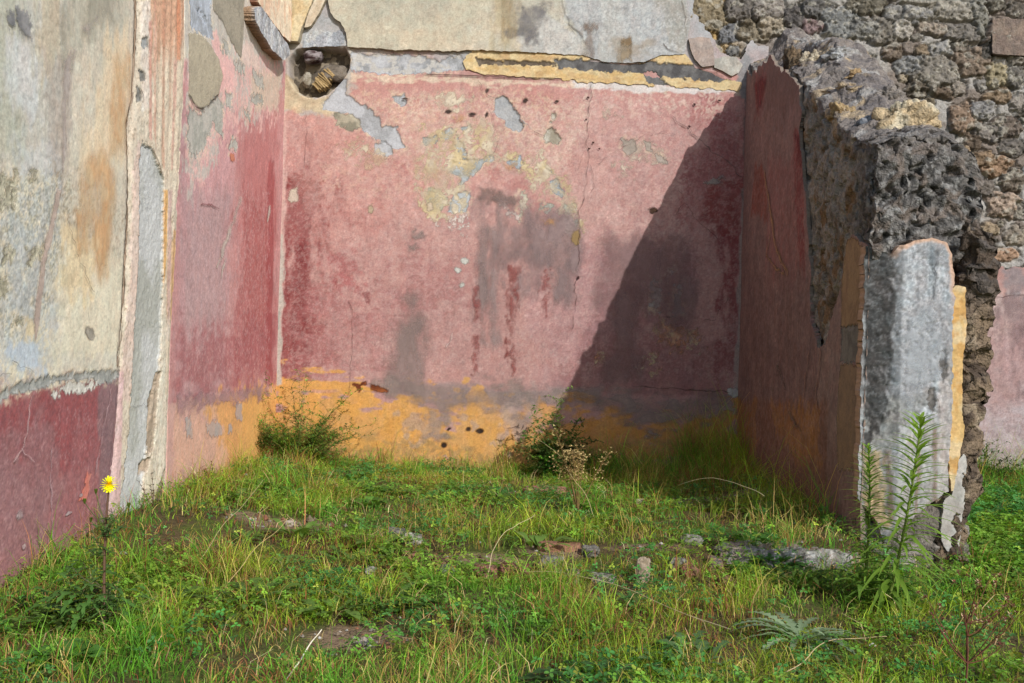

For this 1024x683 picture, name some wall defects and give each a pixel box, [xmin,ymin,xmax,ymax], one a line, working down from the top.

peeling [186,0,264,159]
peeling [414,89,584,236]
spalling [302,28,725,174]
peeling [0,143,164,513]
water stain [478,189,517,310]
water stain [509,210,581,302]
water stain [468,238,738,438]